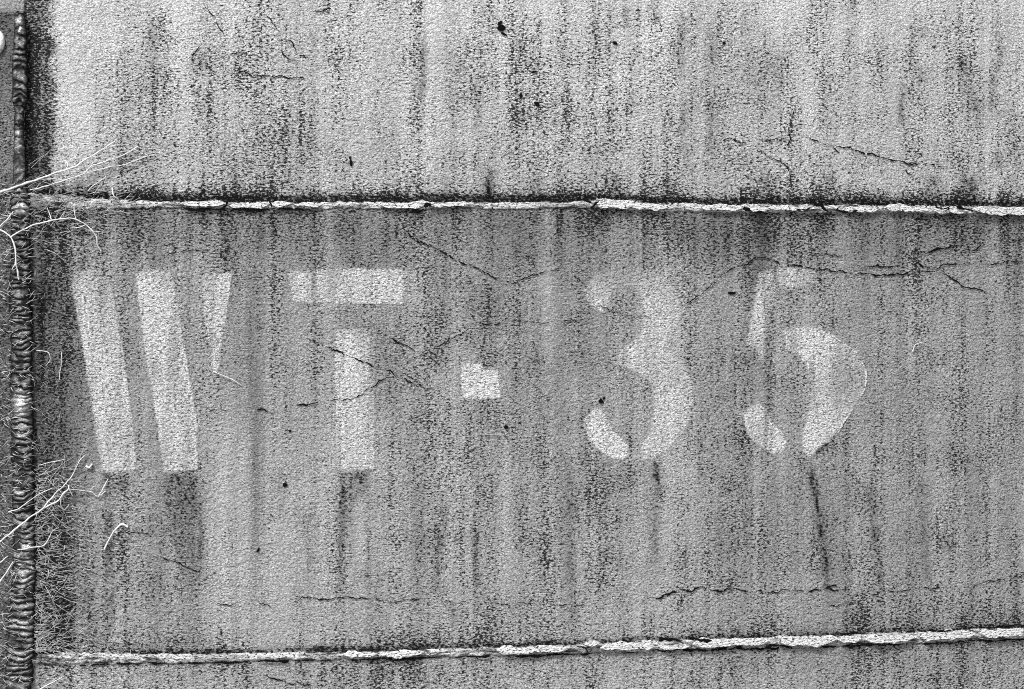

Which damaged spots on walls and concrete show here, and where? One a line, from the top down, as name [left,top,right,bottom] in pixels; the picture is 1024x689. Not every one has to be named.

crack [693,100,941,176]
crack [407,231,556,284]
crack [686,239,1023,304]
crack [257,302,664,414]
leakage [102,473,126,626]
leakage [165,474,204,574]
leakage [336,472,366,578]
leakage [564,471,578,620]
crack [638,584,946,610]
leakage [807,469,829,593]